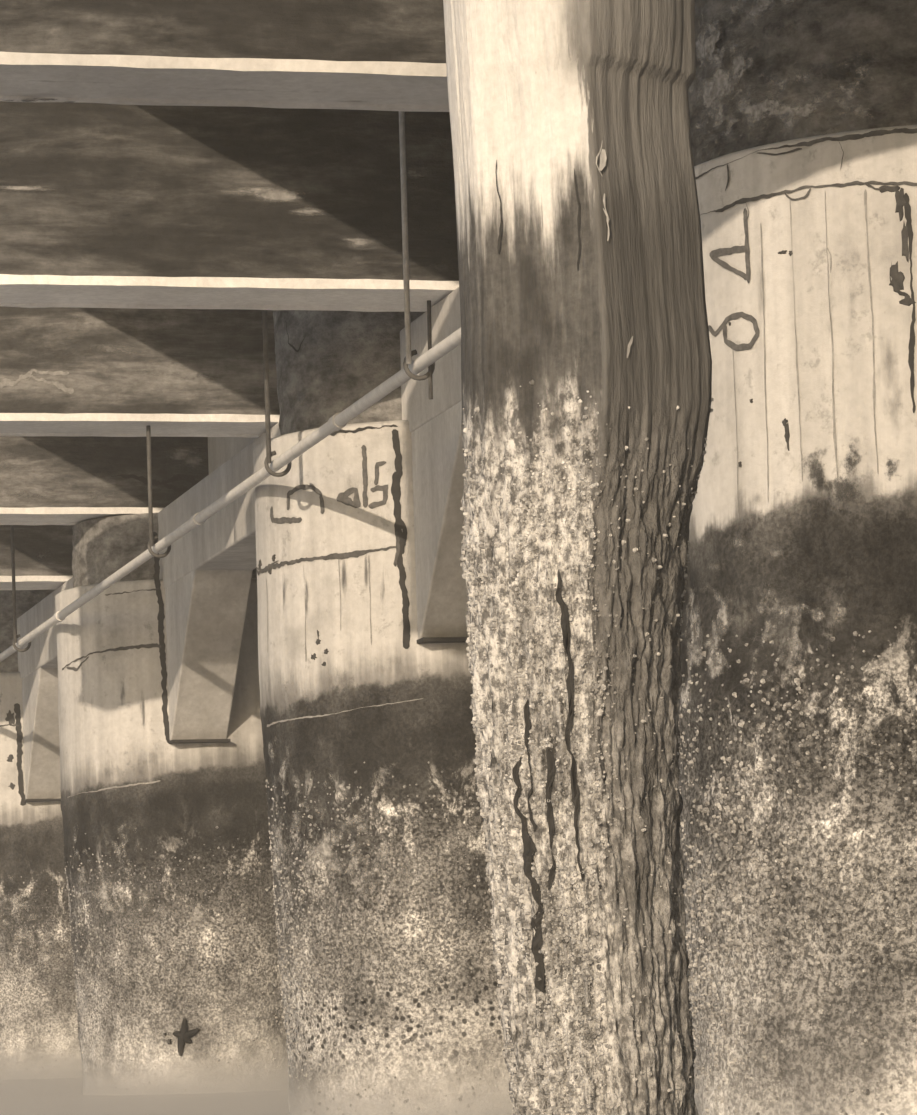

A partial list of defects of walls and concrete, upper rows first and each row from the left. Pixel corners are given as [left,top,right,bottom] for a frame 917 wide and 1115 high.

crack [695,128,917,516]
crack [62,532,170,743]
crack [256,424,410,661]
leakage [806,446,859,500]
crack [0,703,26,806]